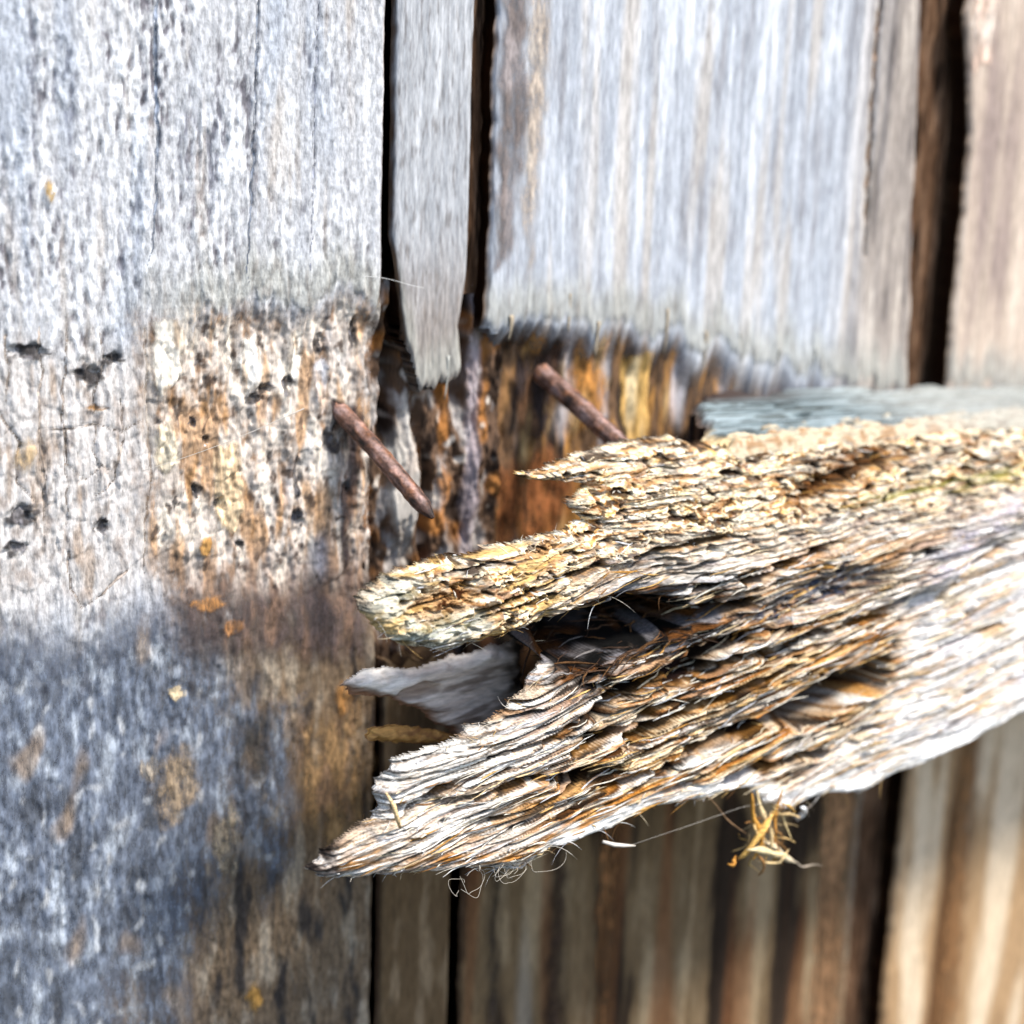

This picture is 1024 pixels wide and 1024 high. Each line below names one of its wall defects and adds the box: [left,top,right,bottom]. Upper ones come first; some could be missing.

crack [149,0,161,261]
crack [246,0,260,282]
rust [331,399,364,567]
rust [496,347,607,544]
leakage [185,585,366,660]
leakage [0,627,363,1024]